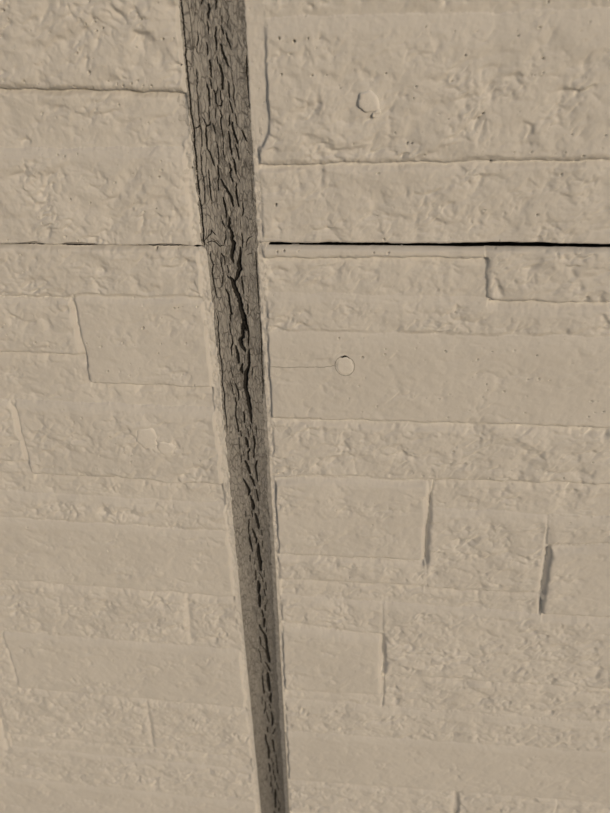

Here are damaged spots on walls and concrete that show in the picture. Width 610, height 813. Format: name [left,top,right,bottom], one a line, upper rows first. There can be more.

crack [180,0,334,813]